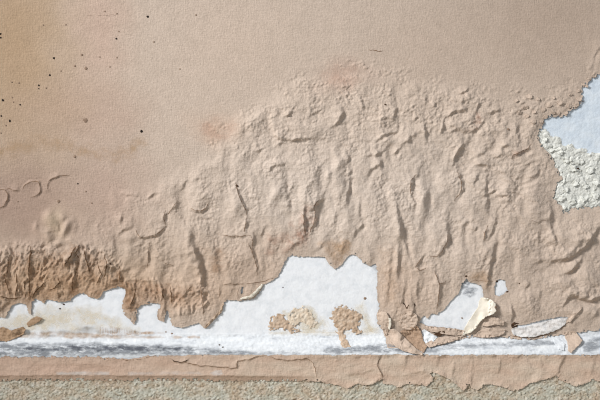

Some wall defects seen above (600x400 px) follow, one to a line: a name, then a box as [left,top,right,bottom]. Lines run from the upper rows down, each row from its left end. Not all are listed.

peeling [515,73,600,214]
peeling [0,253,600,355]